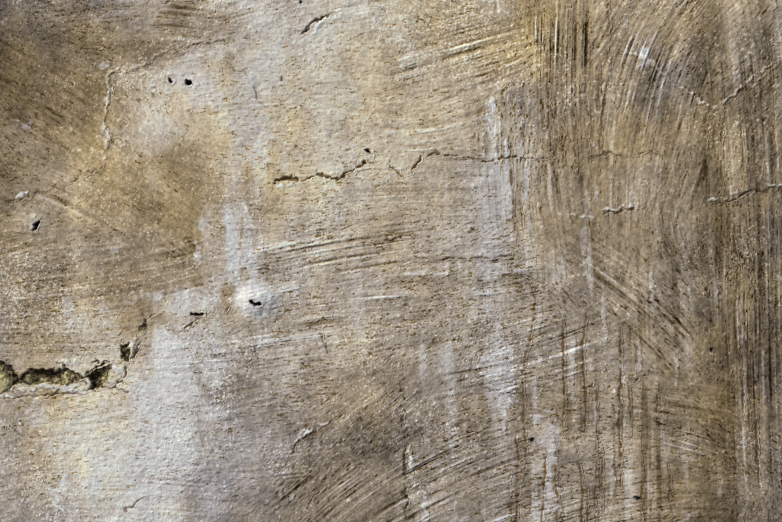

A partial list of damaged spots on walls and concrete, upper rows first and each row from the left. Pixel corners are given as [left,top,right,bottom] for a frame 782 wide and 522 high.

crack [292,8,343,37]
crack [618,49,782,112]
crack [268,149,552,189]
crack [707,182,782,206]
flaking render [0,314,153,400]